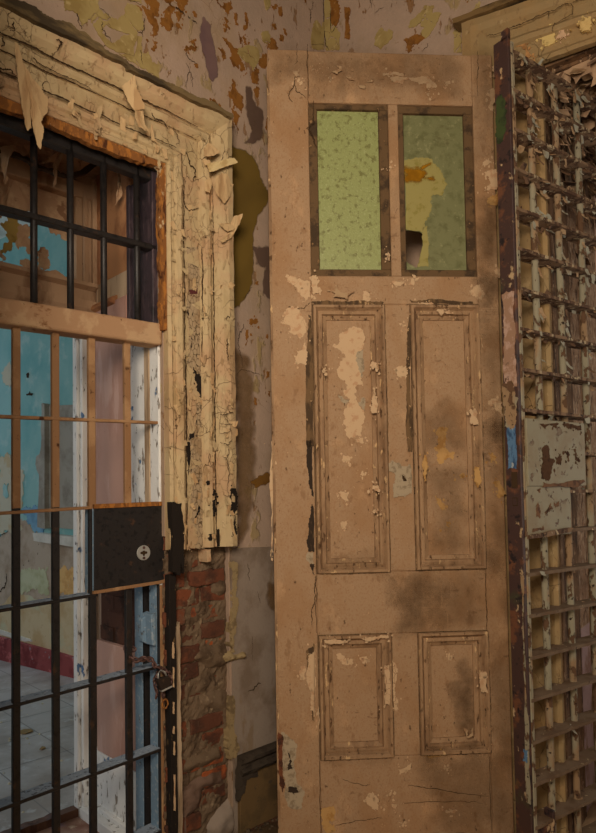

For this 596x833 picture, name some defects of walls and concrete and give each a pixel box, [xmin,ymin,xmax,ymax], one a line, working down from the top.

peeling [14,43,49,149]
peeling [63,0,185,192]
peeling [377,68,454,105]
peeling [0,216,64,276]
peeling [0,145,67,241]
peeling [115,173,123,205]
crack [0,22,262,544]
peeling [202,133,238,211]
peeling [201,203,243,255]
flaking render [0,452,73,605]
flaking render [162,350,259,833]